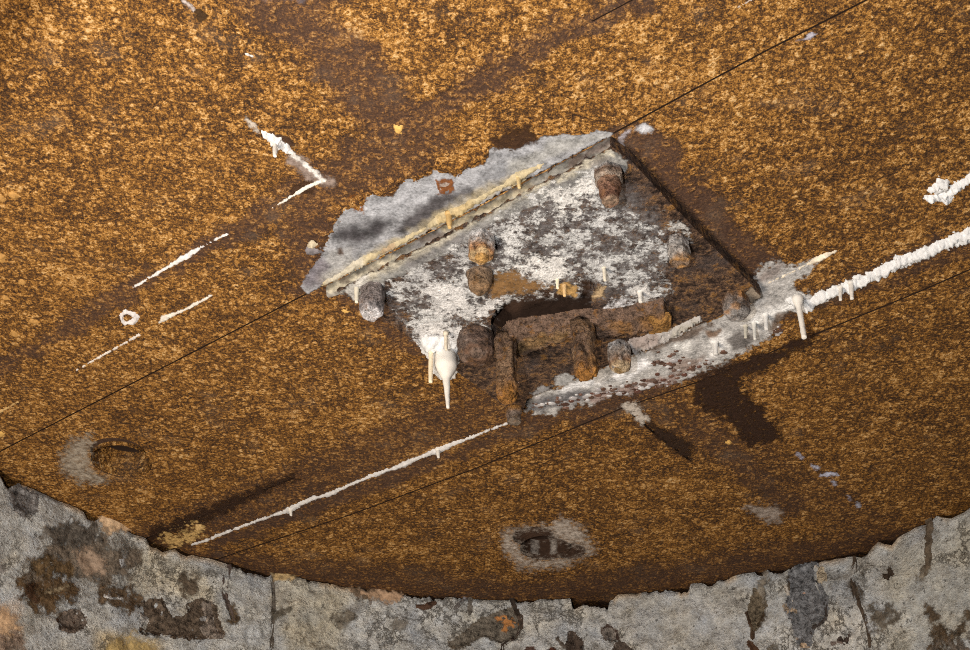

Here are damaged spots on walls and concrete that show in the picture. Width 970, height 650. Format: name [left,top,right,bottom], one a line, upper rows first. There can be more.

damp [245,118,336,208]
peeling [300,130,612,294]
damp [923,173,970,205]
damp [133,233,228,288]
corrosion [489,269,671,358]
damp [524,227,970,461]
peeling [745,287,761,303]
damp [148,473,300,542]
damp [191,423,508,546]
damp [531,539,556,555]